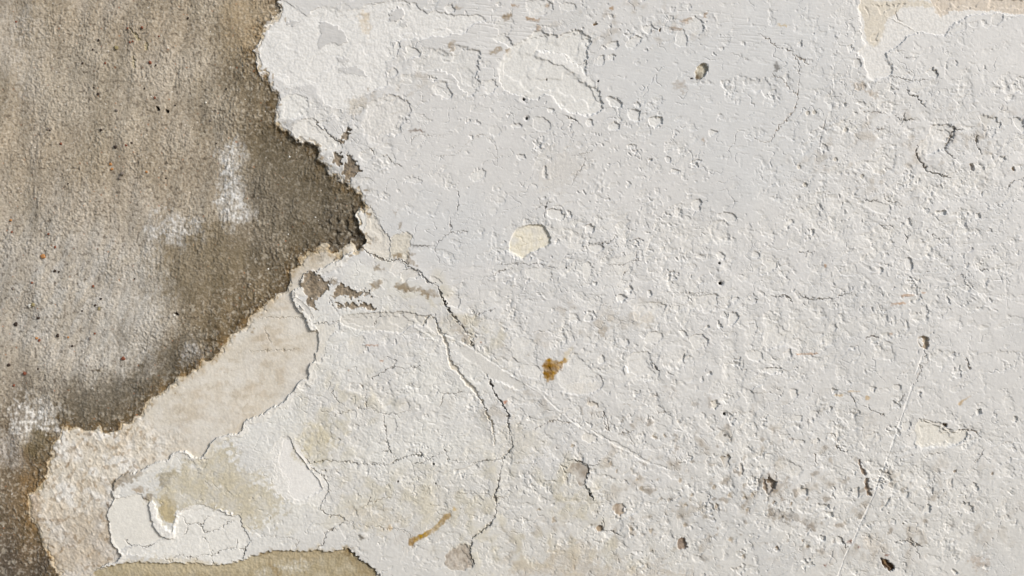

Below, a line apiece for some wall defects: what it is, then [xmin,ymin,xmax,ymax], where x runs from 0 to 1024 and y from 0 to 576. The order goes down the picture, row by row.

leakage [0,0,52,116]
peeling [847,0,1024,81]
crack [863,57,982,178]
leakage [0,116,372,471]
crack [249,299,340,353]
flaking render [0,0,663,576]
crack [240,357,537,576]
crack [361,191,495,348]
corrosion [542,347,575,383]
crack [486,374,634,444]
corrosion [408,514,445,549]